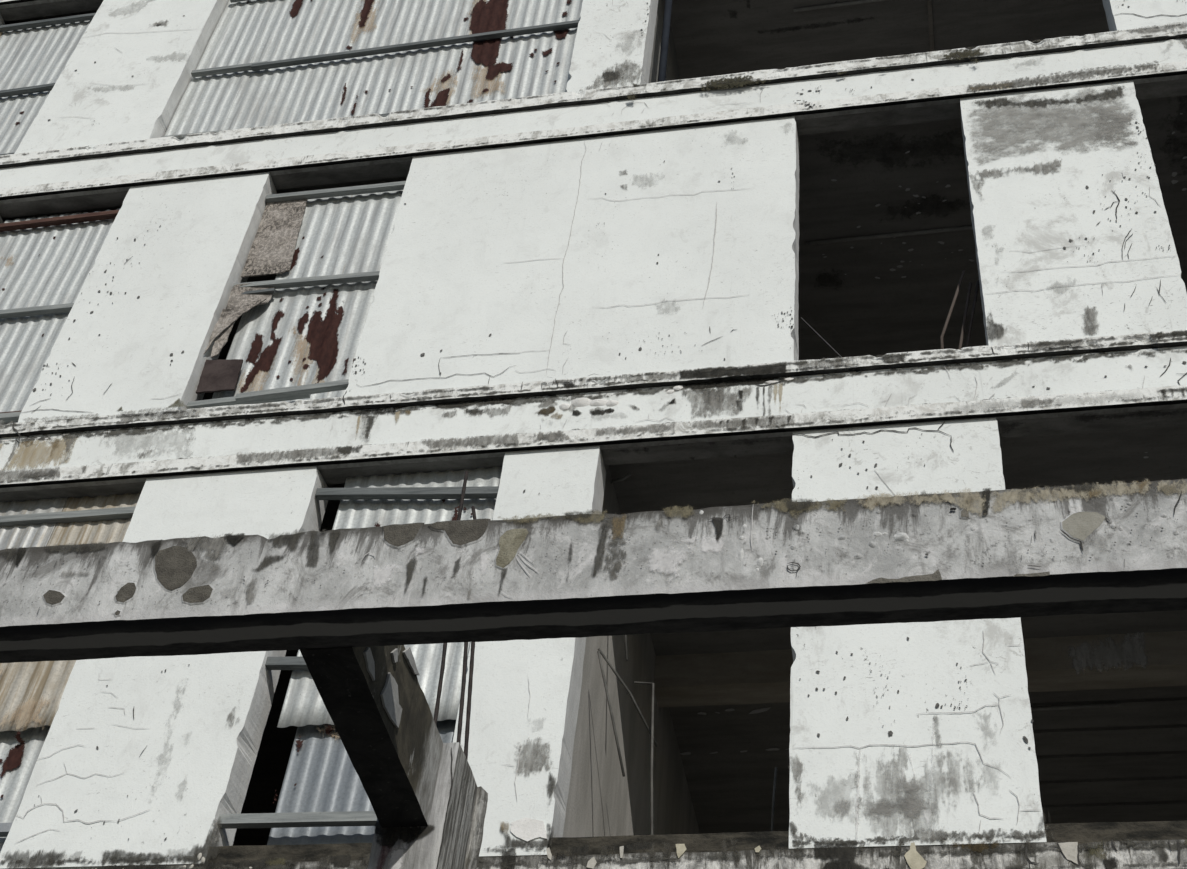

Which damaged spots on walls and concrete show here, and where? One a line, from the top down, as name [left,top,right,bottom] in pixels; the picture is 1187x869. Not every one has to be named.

corrosion [411,0,514,108]
water stain [821,61,1187,195]
crack [343,140,749,404]
corrosion [239,287,354,393]
water stain [0,306,1187,482]
spalling [32,589,67,607]
spalling [108,582,156,618]
spalling [153,545,216,606]
water stain [246,530,340,603]
corrosion [0,697,56,778]
crack [15,728,150,843]
water stain [477,716,1061,869]